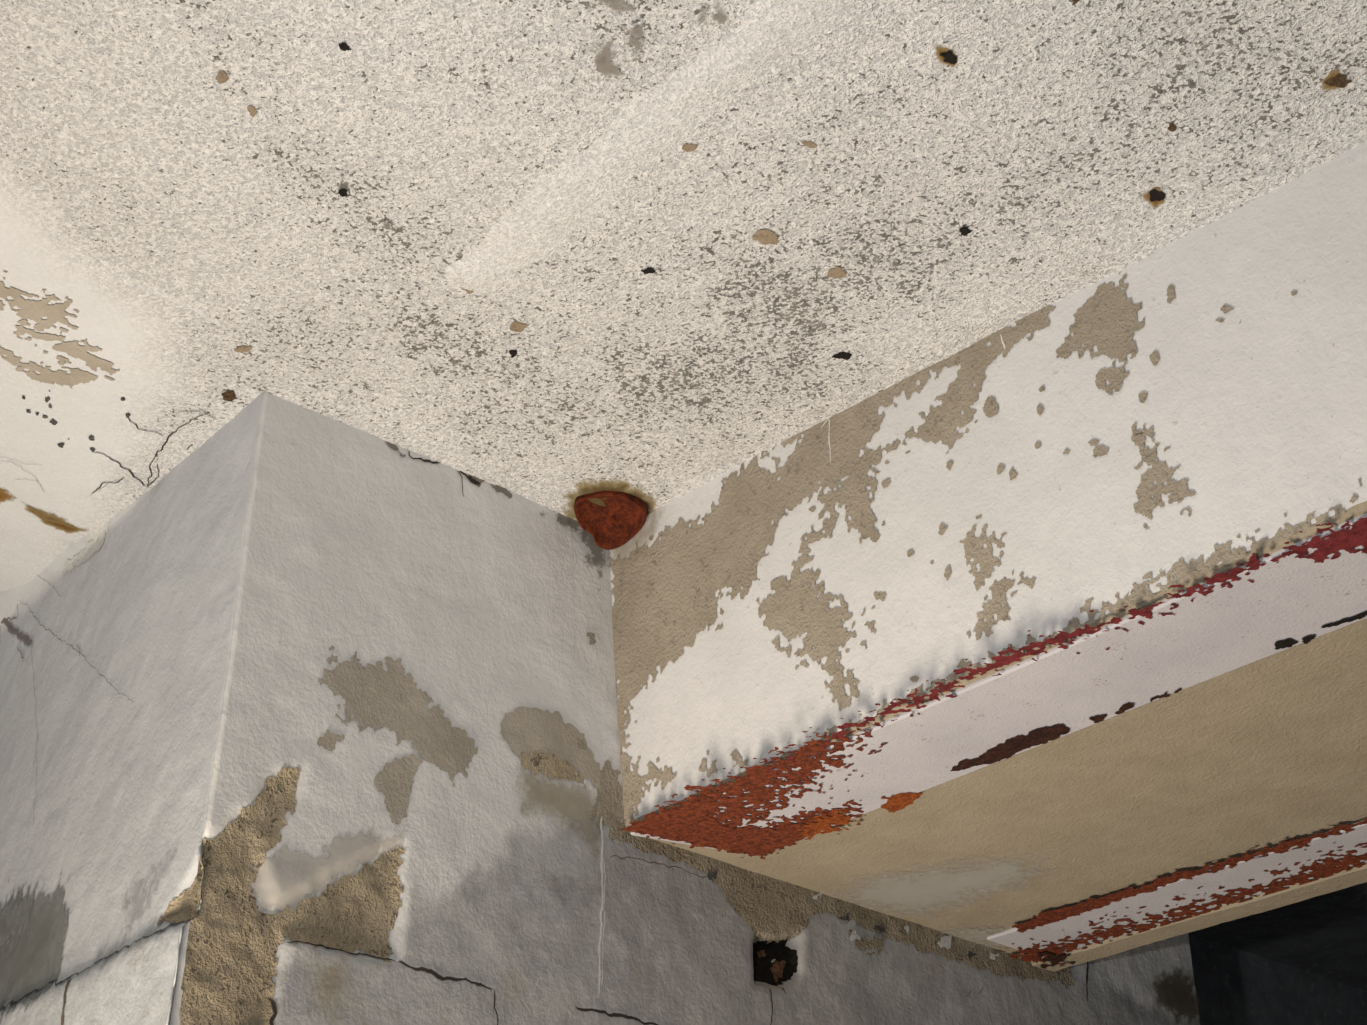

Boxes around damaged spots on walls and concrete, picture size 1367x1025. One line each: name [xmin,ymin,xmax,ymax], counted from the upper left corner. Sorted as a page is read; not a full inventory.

peeling [0,271,120,389]
peeling [1056,272,1159,396]
rust [0,489,85,533]
peeling [500,305,1367,990]
damp [0,884,69,1023]
crack [268,998,277,1025]
spalling [157,645,478,1025]
crack [288,941,498,1025]
crack [575,1006,658,1025]
rust [617,723,888,860]
rust [951,724,1070,771]
rust [997,818,1367,969]